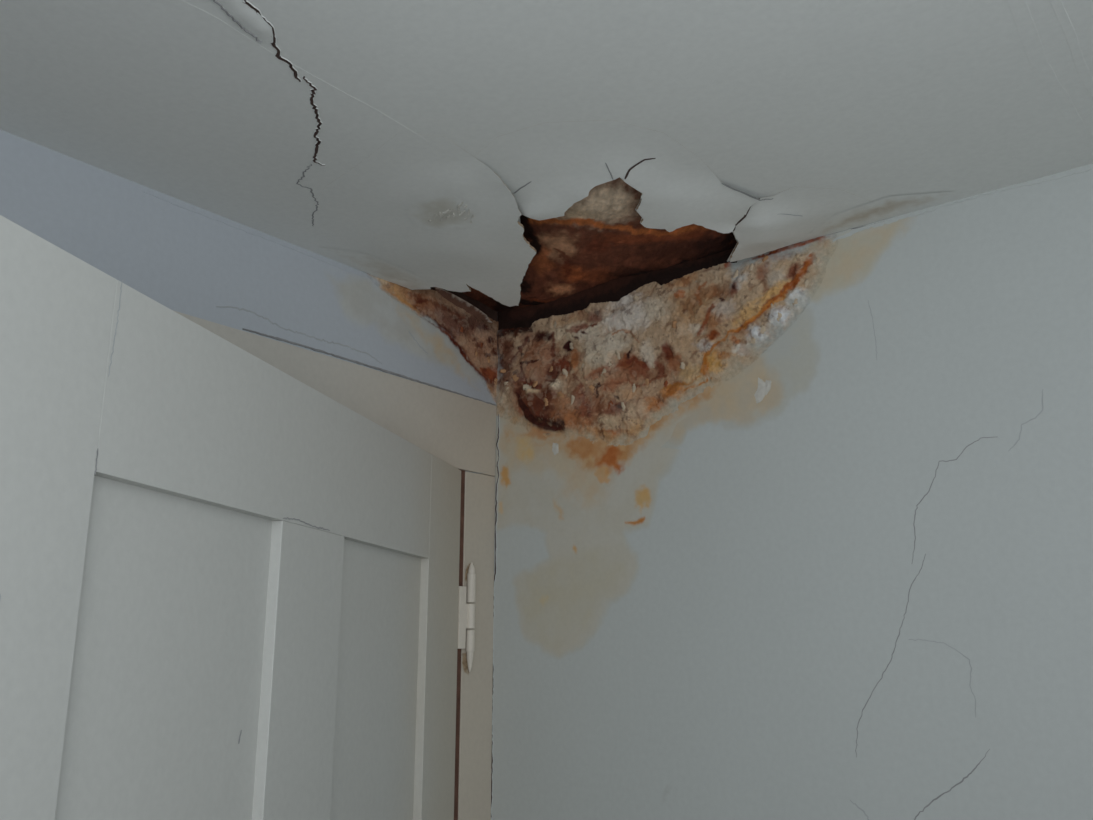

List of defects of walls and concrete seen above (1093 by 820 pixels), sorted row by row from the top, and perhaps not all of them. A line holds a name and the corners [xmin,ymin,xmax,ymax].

crack [213,0,325,226]
water stain [313,247,737,403]
flaking render [364,177,839,446]
water stain [495,191,956,662]
crack [855,389,1043,757]
crack [914,749,990,820]